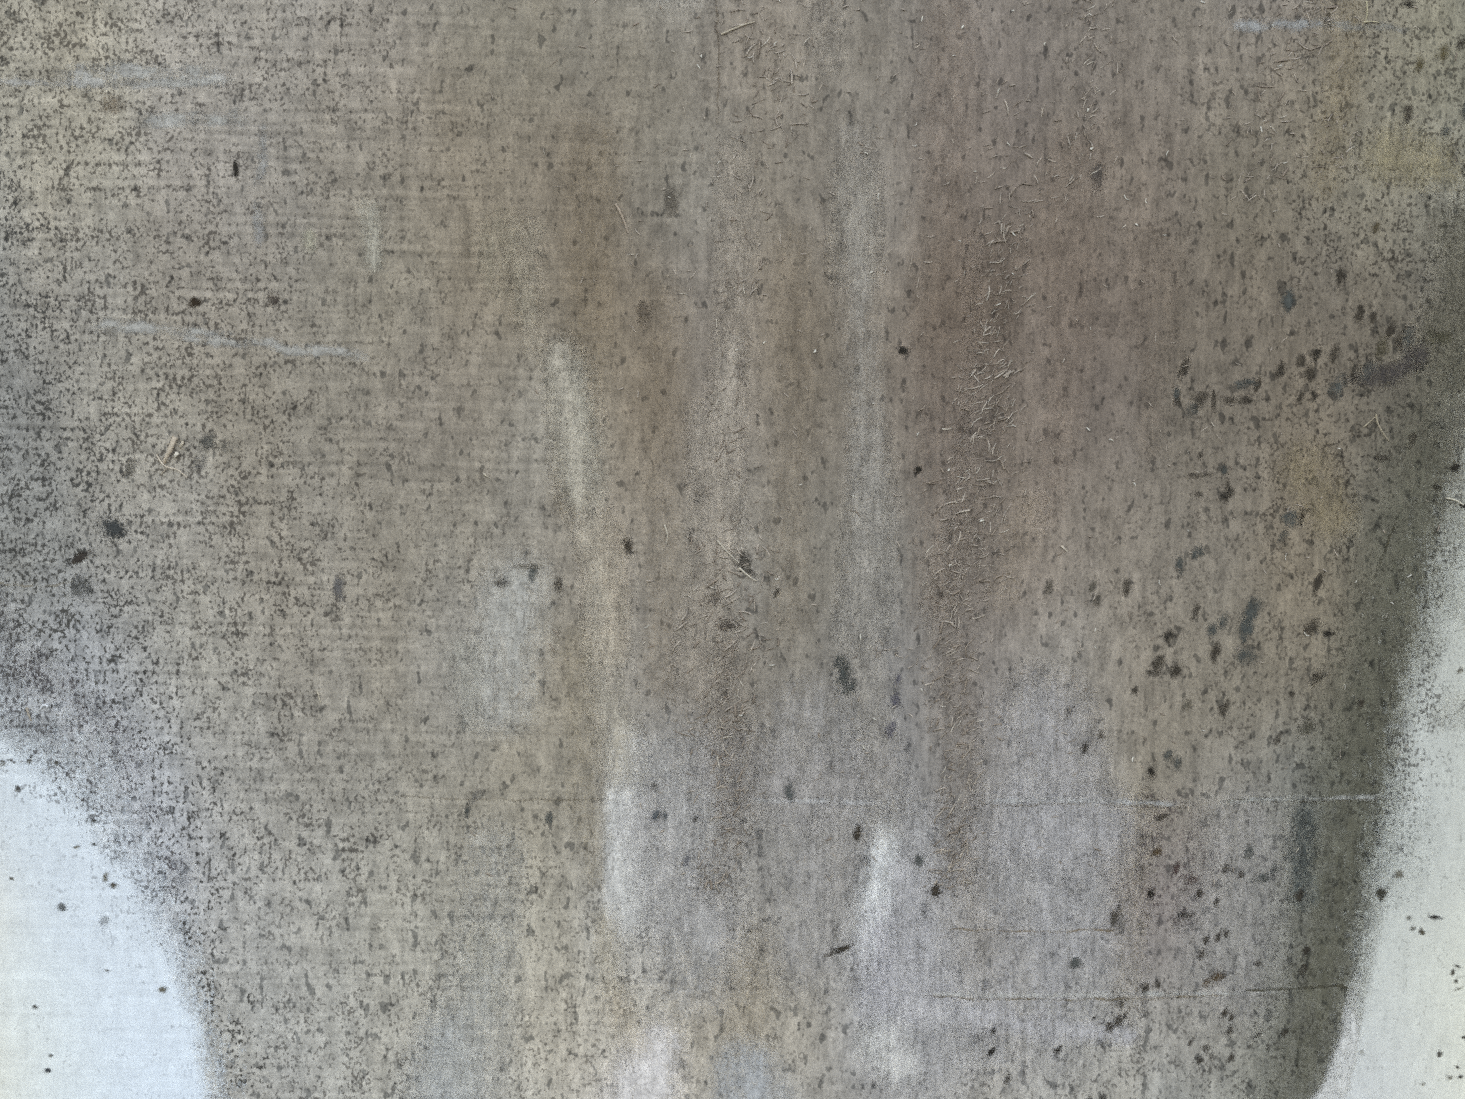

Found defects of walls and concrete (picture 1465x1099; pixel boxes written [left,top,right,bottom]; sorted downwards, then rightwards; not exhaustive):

leakage [1414,36,1465,74]
leakage [353,196,386,275]
leakage [170,329,372,361]
leakage [331,569,347,605]
leakage [435,0,1451,1099]
leakage [393,789,535,1099]